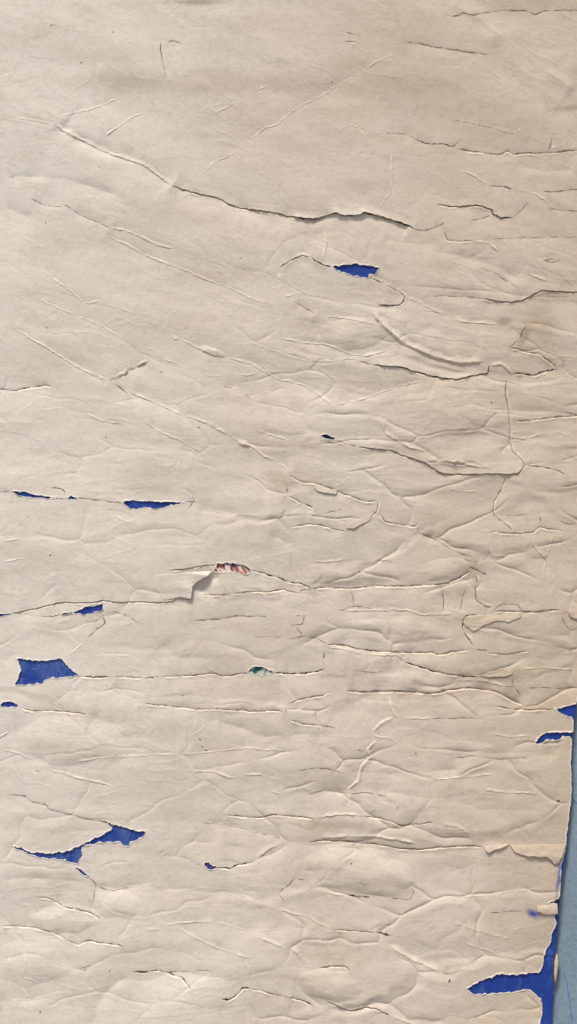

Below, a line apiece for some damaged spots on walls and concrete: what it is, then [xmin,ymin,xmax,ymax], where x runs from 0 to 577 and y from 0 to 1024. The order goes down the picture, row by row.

crack [454,9,577,17]
crack [410,42,485,55]
crack [399,133,577,158]
crack [0,385,50,394]
crack [79,326,577,730]
crack [21,707,86,718]
crack [225,768,430,829]
crack [217,863,252,872]
crack [327,888,414,936]
crack [0,878,126,970]
crack [134,970,211,990]
crack [220,987,311,1007]